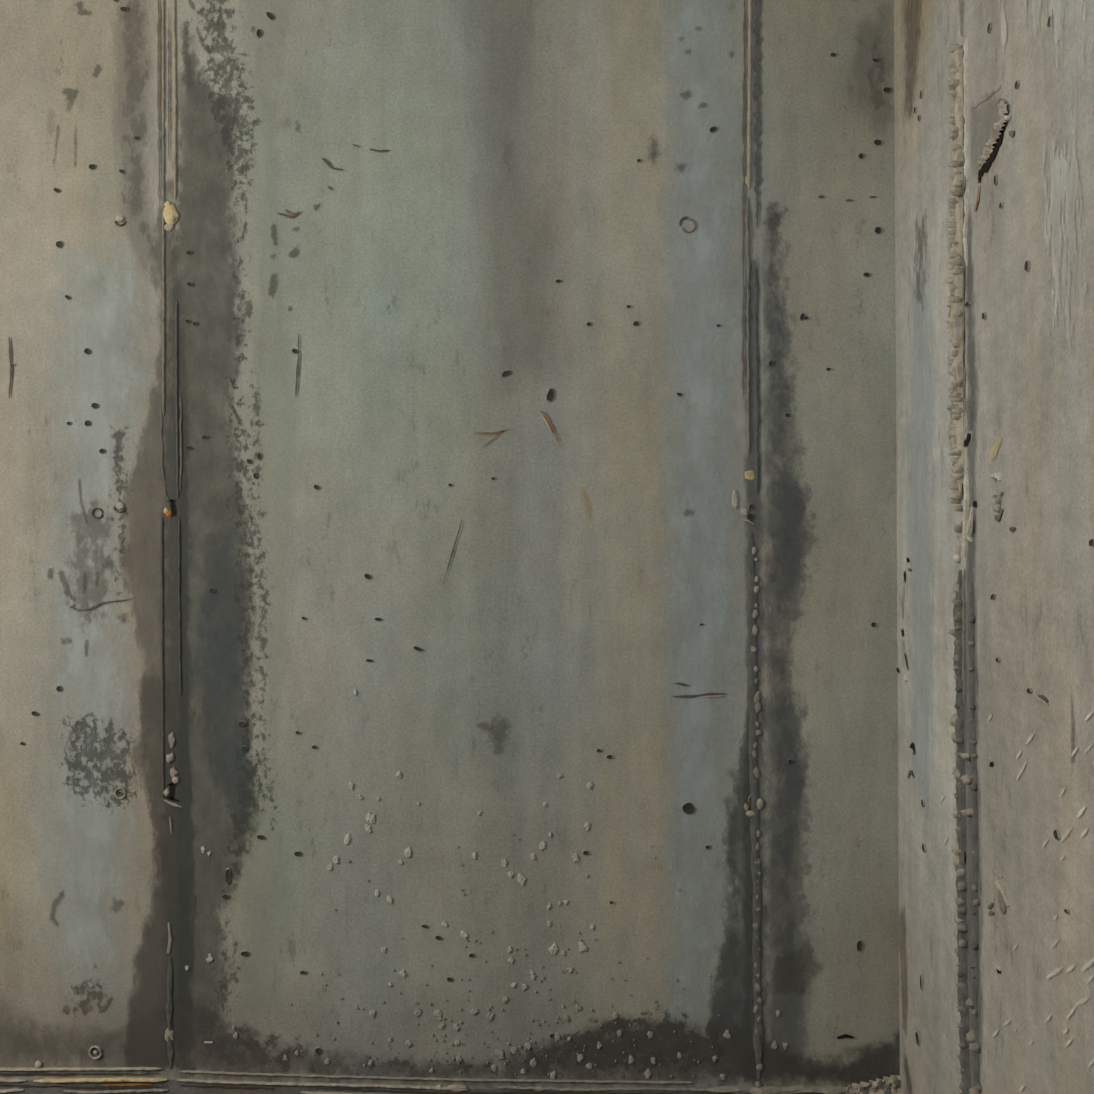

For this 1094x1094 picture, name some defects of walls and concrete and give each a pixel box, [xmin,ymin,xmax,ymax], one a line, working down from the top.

spalling [970,85,1014,212]
water stain [48,265,187,975]
water stain [388,0,912,1094]
water stain [137,814,188,1054]
water stain [172,1010,375,1083]